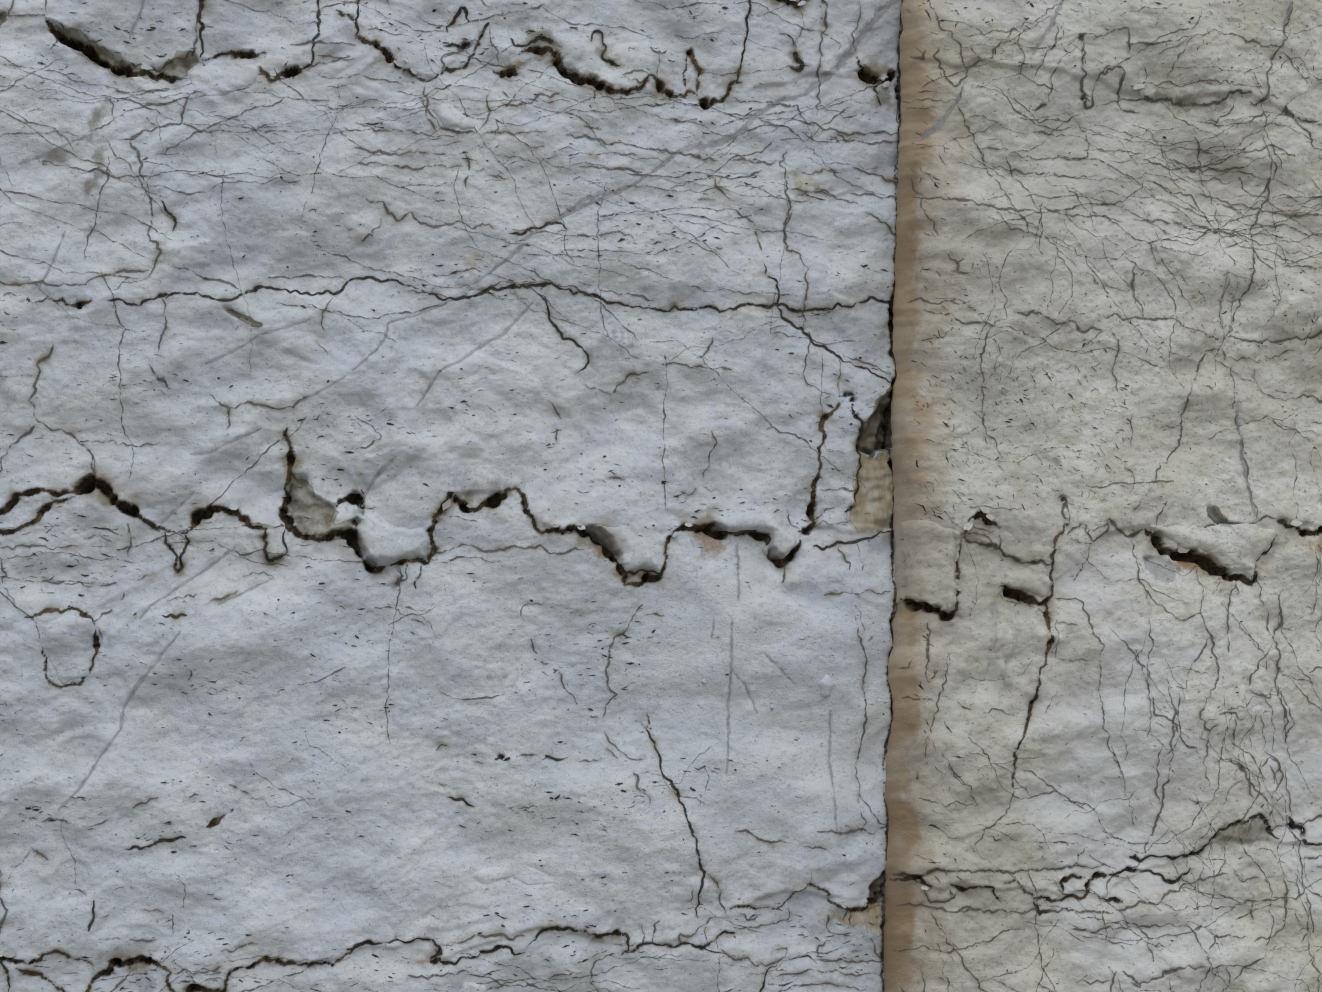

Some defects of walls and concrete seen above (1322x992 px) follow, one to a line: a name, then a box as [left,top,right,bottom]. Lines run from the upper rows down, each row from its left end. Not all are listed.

spalling [55,26,199,82]
crack [0,0,1322,770]
spalling [287,472,354,539]
peeling [849,387,894,533]
peeling [963,506,995,531]
spalling [1207,505,1229,524]
crack [448,797,474,807]
crack [477,605,757,932]
crack [817,617,889,860]
crack [903,498,1322,992]
crack [0,798,350,992]
crack [462,878,925,992]